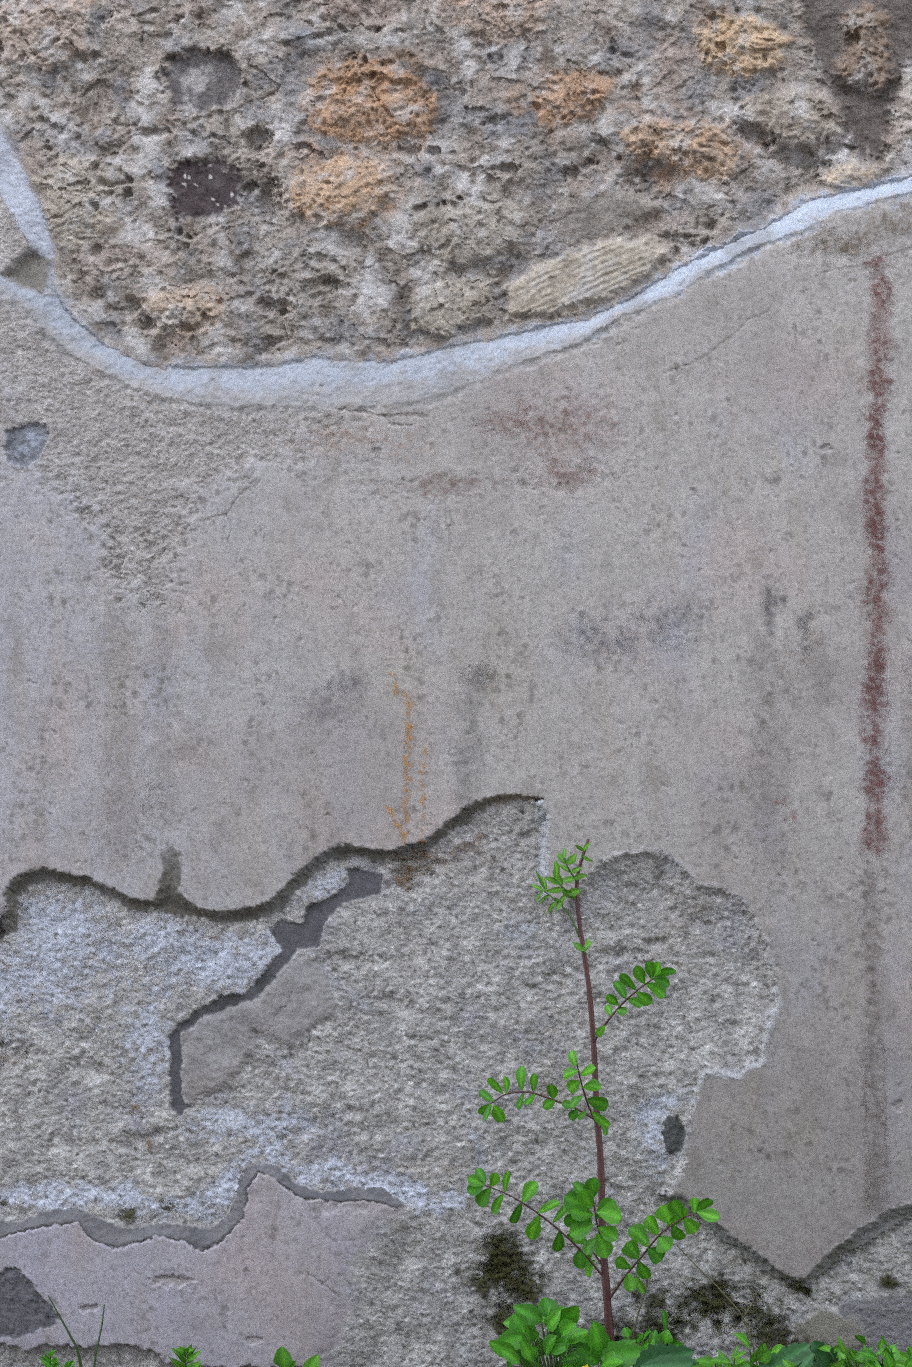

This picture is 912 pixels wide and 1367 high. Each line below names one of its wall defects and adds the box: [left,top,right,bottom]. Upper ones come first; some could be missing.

spalling [0,0,912,371]
peeling [0,300,376,613]
spalling [0,793,912,1367]